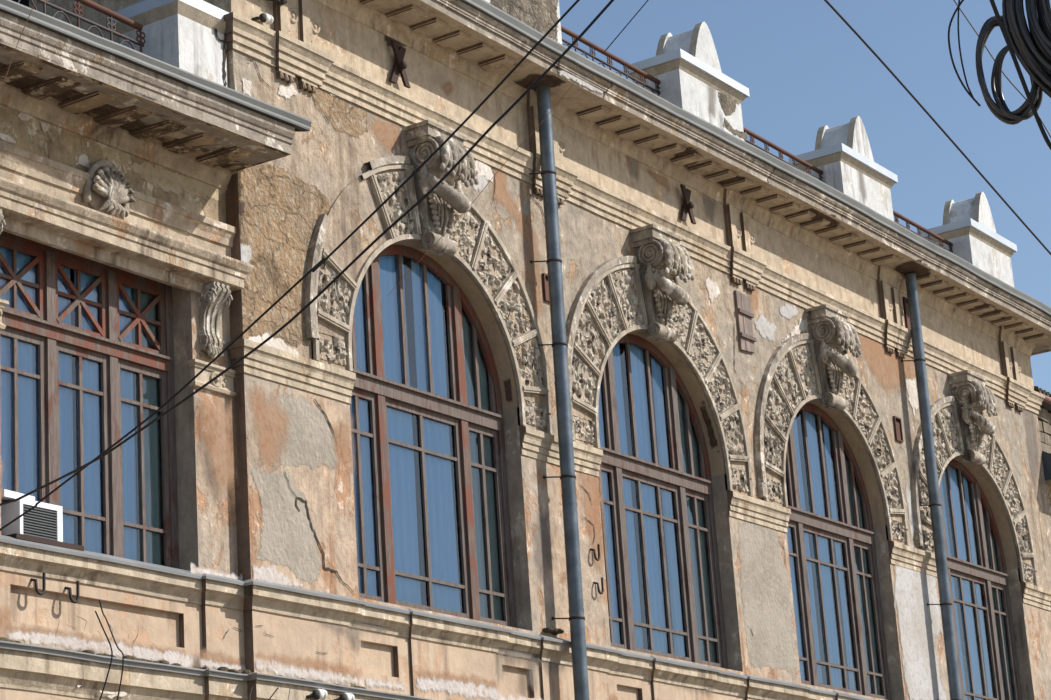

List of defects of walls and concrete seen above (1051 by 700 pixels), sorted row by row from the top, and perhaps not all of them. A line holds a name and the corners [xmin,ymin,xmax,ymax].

crack [314,399,336,439]
crack [285,472,355,595]
leakage [8,631,557,700]